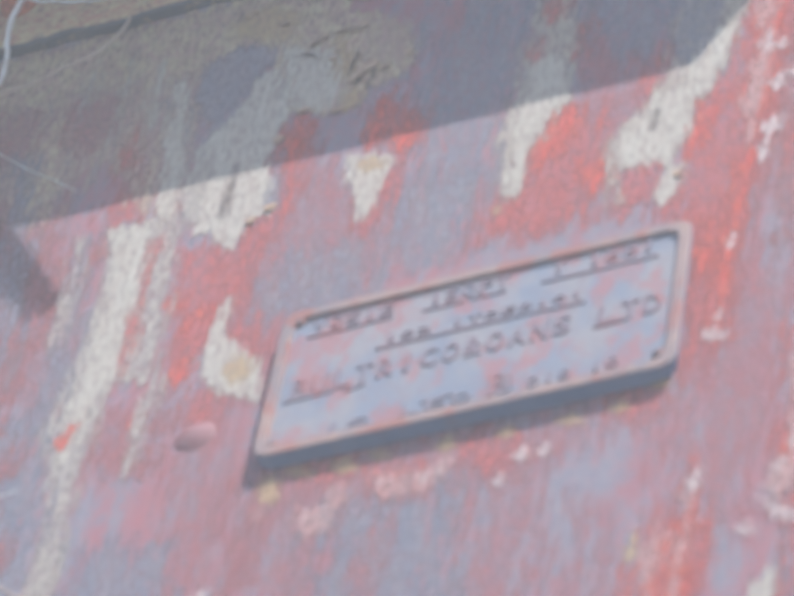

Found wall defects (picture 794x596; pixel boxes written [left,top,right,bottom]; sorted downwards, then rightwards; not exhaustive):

peeling [342,149,398,223]
peeling [490,0,581,215]
peeling [598,0,755,208]
peeling [19,68,296,596]